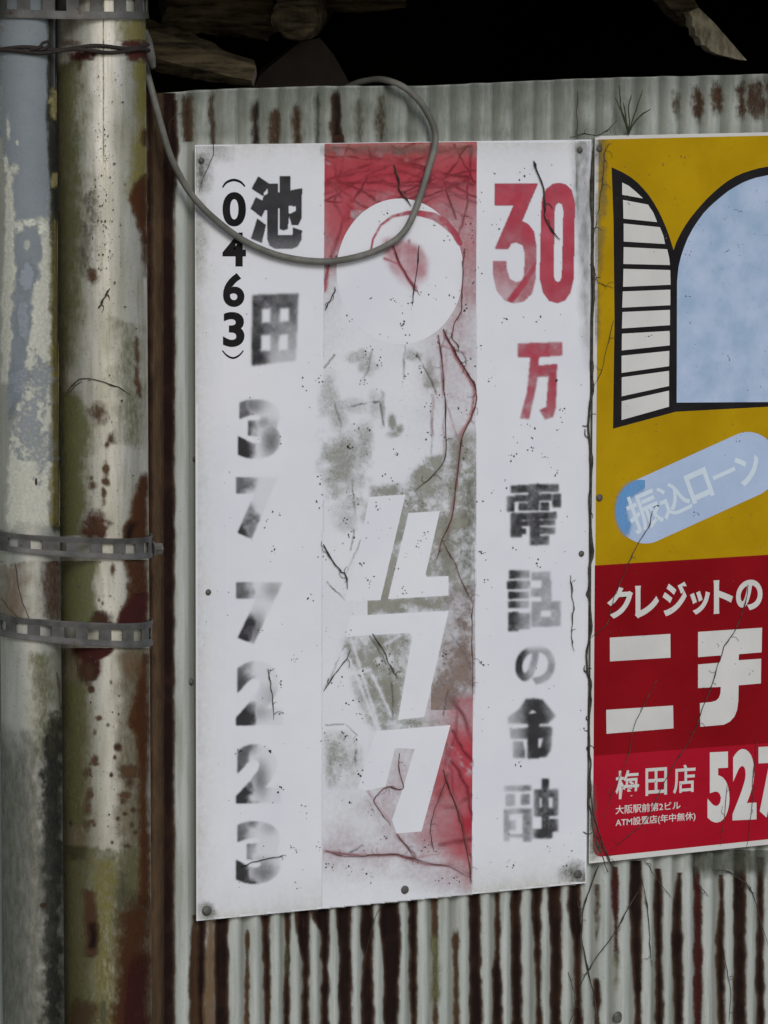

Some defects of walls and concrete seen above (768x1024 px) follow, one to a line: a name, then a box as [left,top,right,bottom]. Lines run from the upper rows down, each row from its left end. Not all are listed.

corrosion [329,91,345,143]
corrosion [376,97,384,140]
corrosion [693,83,723,119]
corrosion [735,81,768,119]
peeling [0,0,55,485]
corrosion [72,90,193,1024]
corrosion [188,915,230,1024]
corrosion [244,900,418,1024]
corrosion [452,884,601,1024]
corrosion [595,858,765,1024]